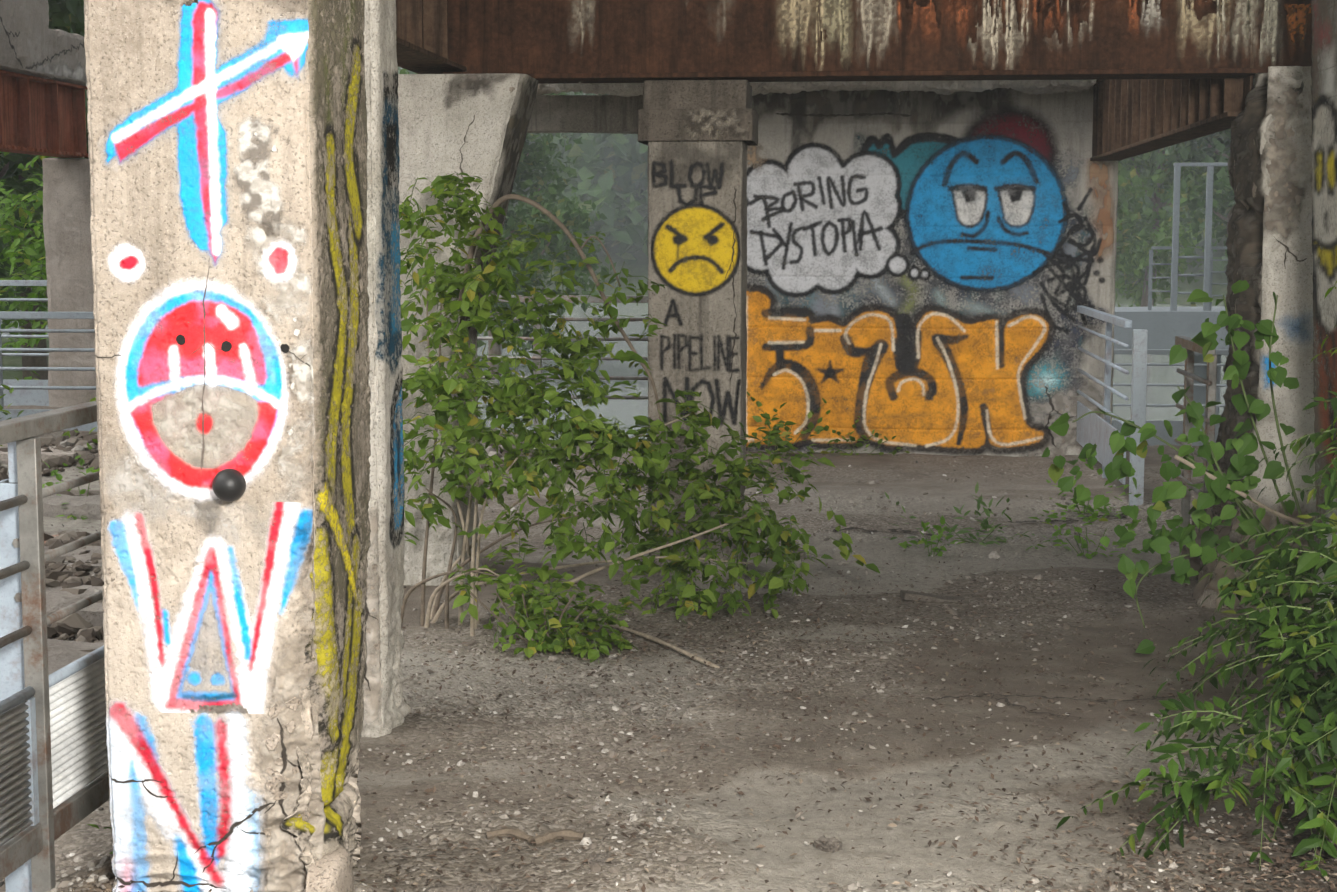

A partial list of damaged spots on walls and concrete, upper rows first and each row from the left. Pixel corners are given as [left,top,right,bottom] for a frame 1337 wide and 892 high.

crack [0,17,84,70]
corrosion [1287,4,1311,43]
spalling [1213,78,1305,482]
crack [110,718,301,889]